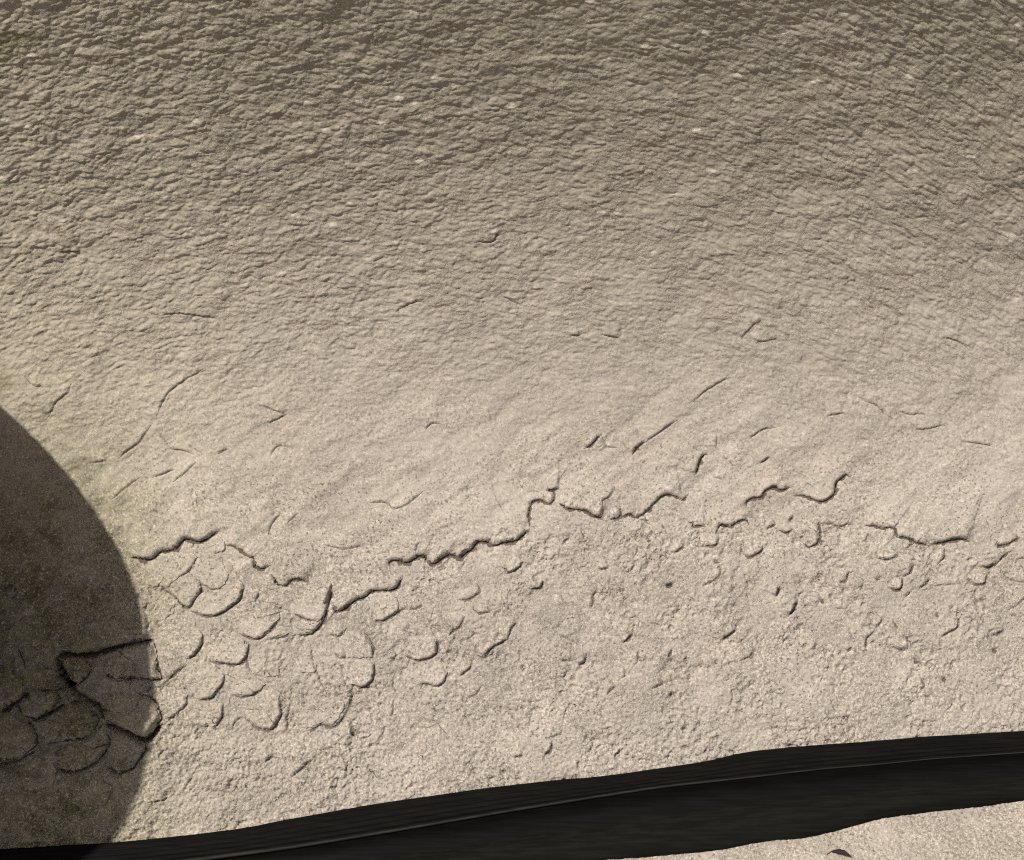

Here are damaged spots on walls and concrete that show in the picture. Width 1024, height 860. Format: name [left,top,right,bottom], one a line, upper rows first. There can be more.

crack [129,531,307,587]
crack [333,474,970,613]
crack [981,537,1024,609]
crack [0,638,163,777]